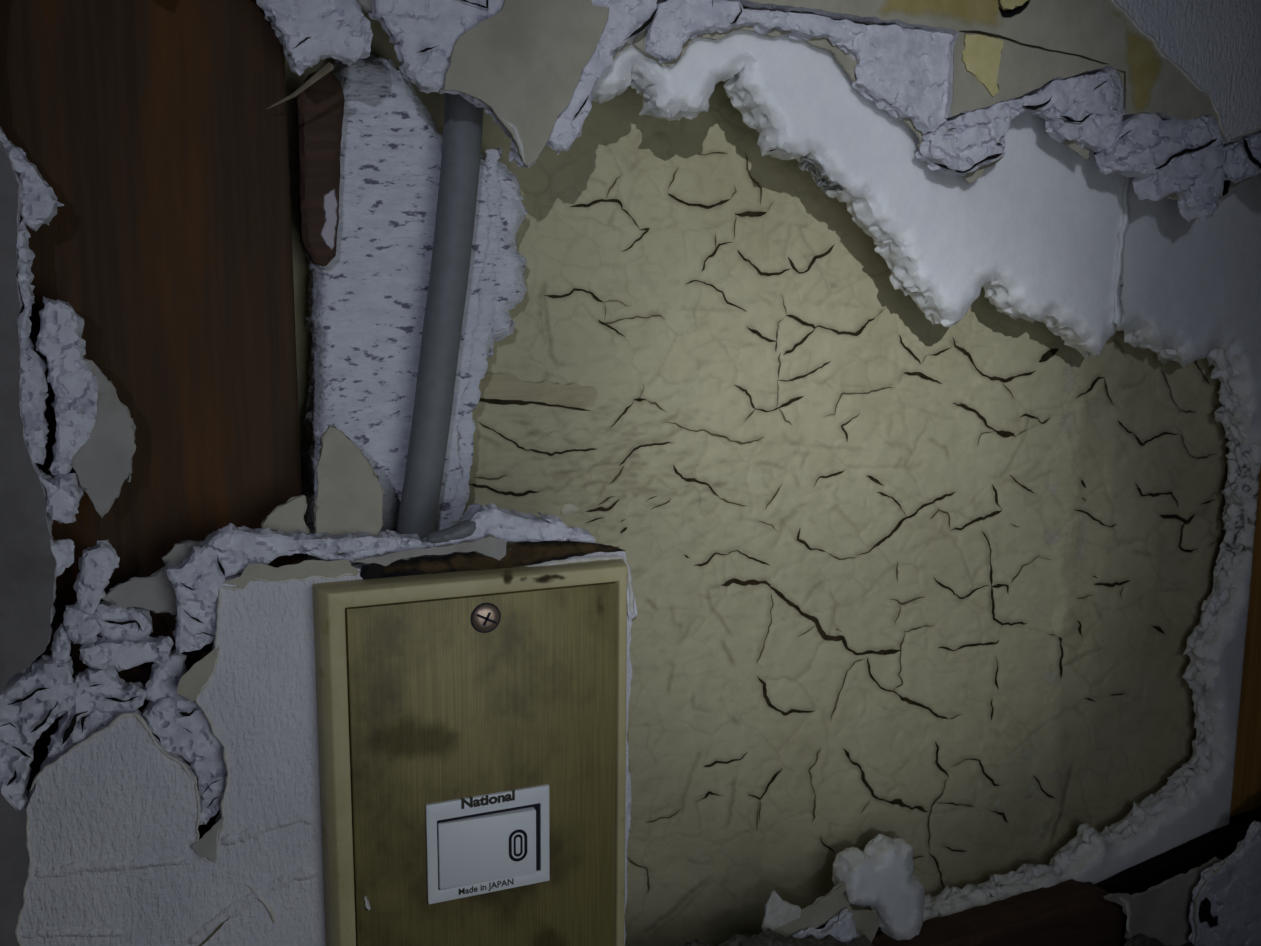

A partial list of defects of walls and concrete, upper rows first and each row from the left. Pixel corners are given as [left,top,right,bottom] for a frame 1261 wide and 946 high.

flaking render [256,0,1261,222]
flaking render [0,127,99,524]
flaking render [0,503,596,825]
flaking render [762,889,859,944]
flaking render [1188,821,1261,946]